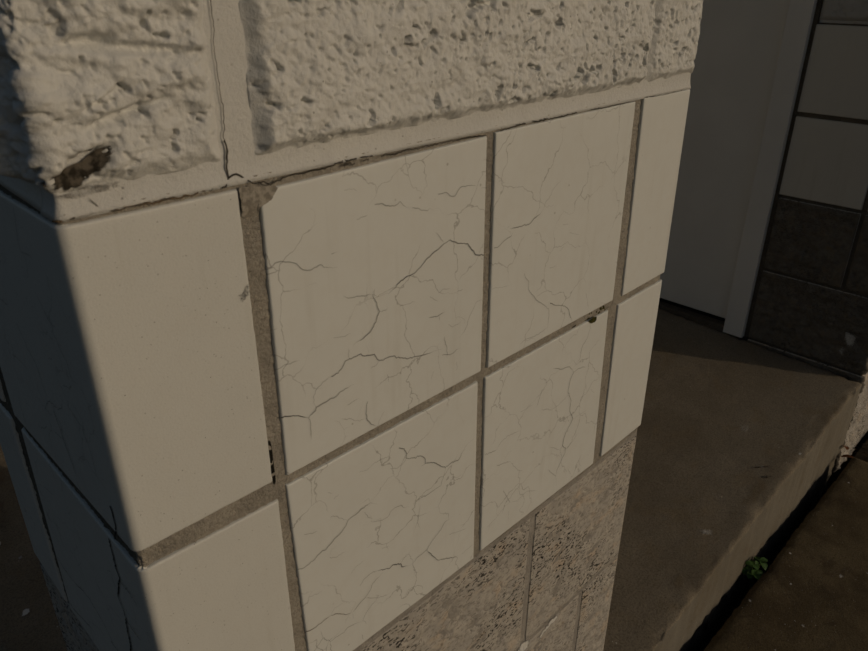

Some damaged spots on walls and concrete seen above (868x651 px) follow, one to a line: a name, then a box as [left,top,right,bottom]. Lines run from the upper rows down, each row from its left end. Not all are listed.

crack [90,0,684,212]
crack [395,240,483,288]
crack [281,300,426,418]
crack [109,507,140,651]